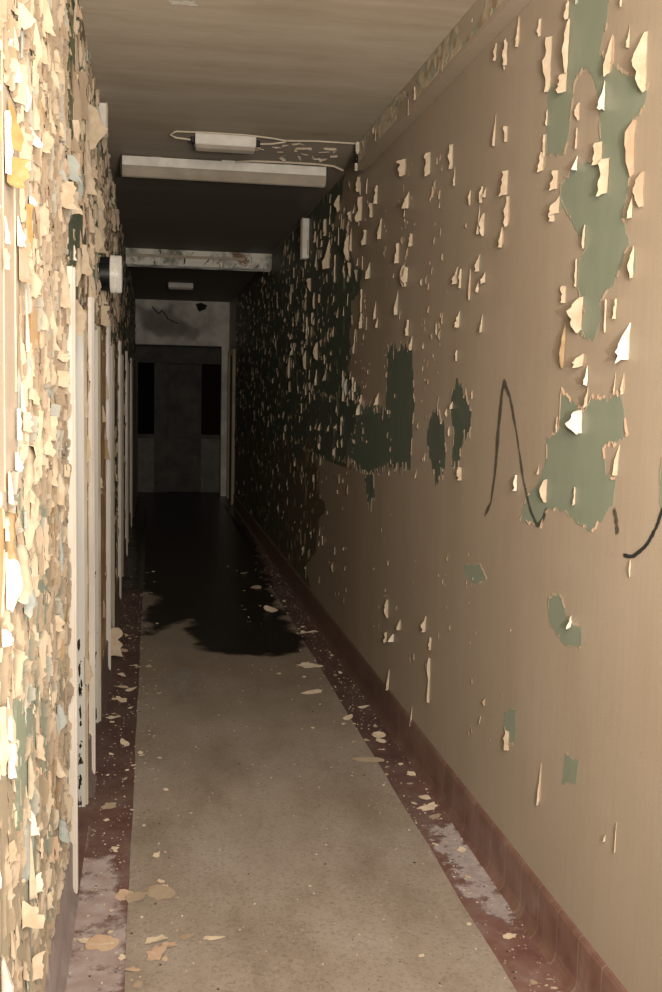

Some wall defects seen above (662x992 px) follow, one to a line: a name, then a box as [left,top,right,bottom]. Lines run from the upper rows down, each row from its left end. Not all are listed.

peeling [493,17,520,70]
peeling [492,117,508,146]
peeling [424,144,455,210]
peeling [465,186,486,236]
peeling [498,170,510,248]
peeling [446,255,485,300]
peeling [513,0,650,533]
peeling [204,158,473,588]
peeling [0,0,194,992]
damp [122,492,307,656]
peeling [373,600,401,643]
peeling [413,616,451,703]